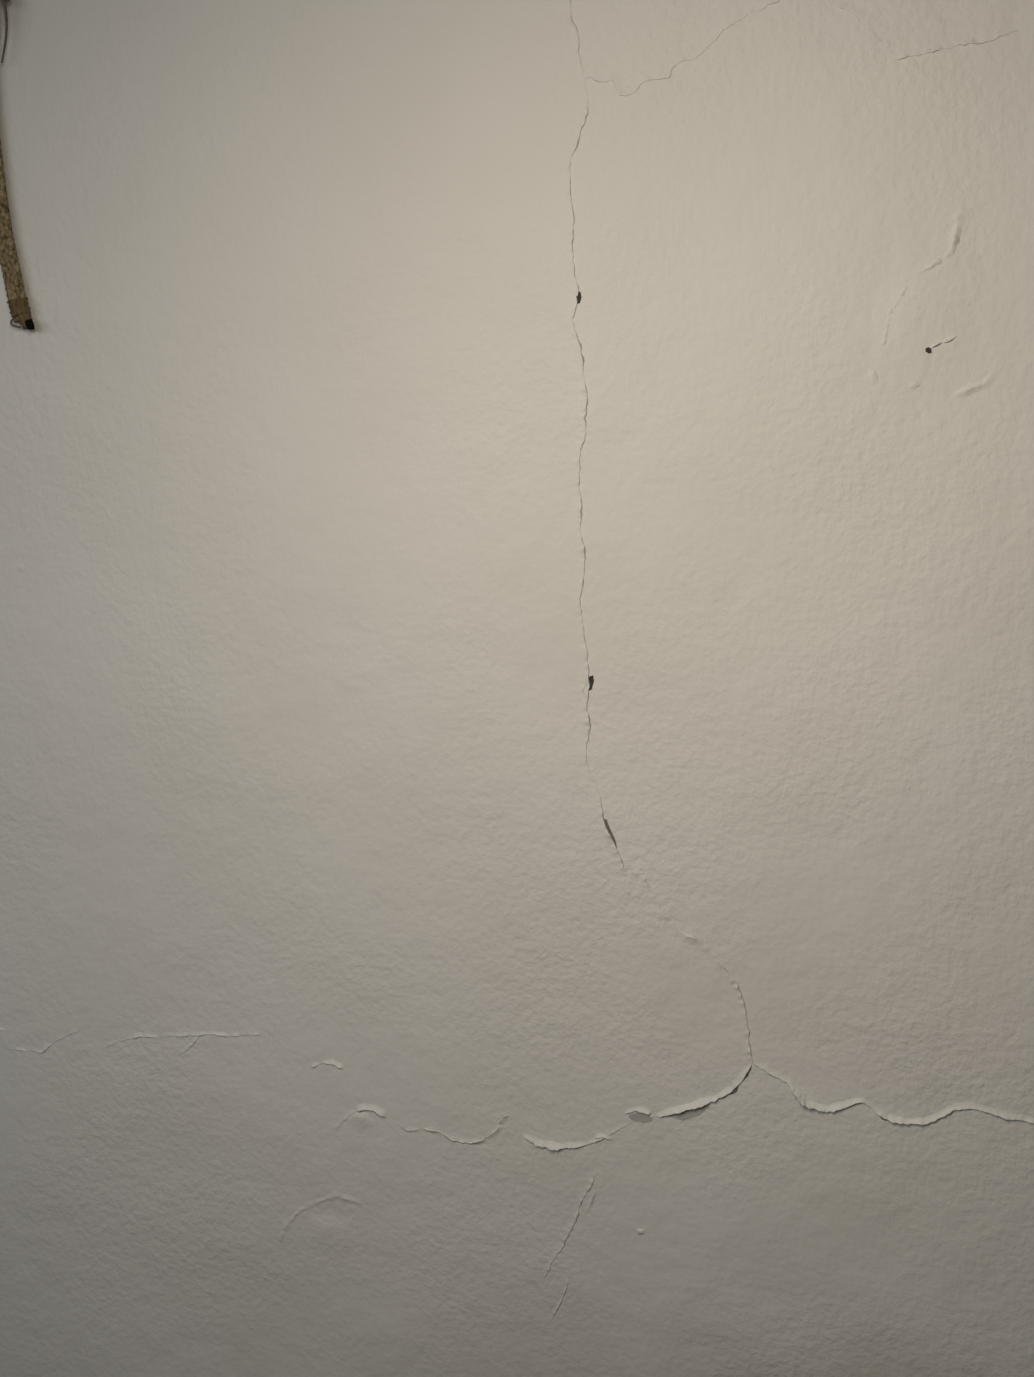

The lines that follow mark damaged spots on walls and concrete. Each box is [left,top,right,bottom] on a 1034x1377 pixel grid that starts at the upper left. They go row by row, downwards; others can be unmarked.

crack [397,0,1034,1319]